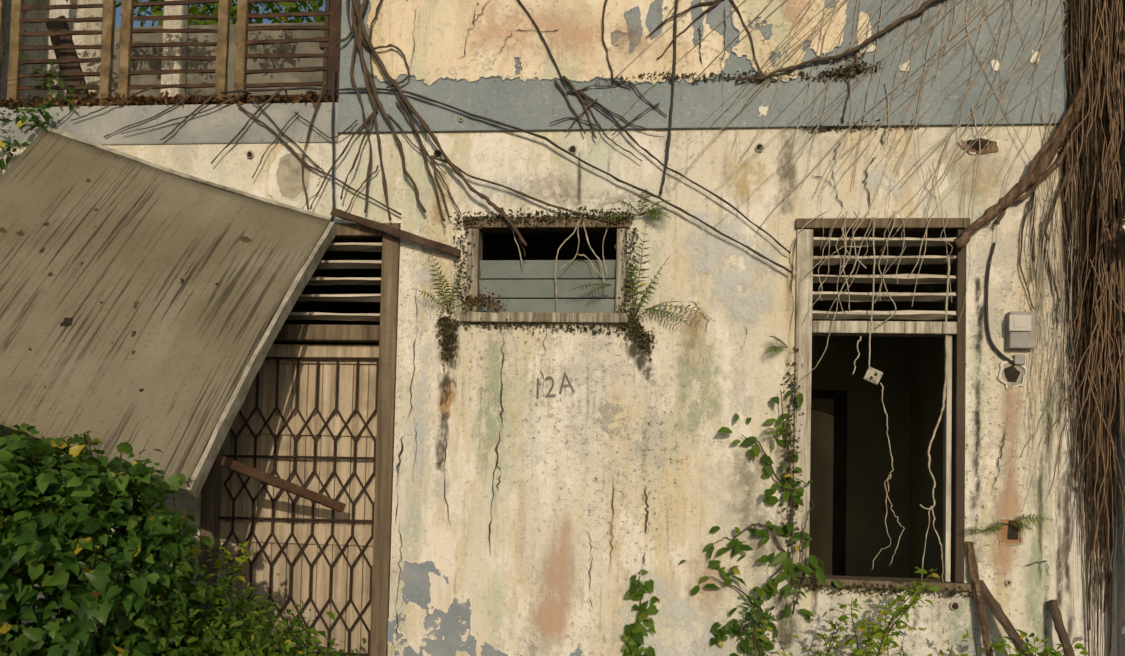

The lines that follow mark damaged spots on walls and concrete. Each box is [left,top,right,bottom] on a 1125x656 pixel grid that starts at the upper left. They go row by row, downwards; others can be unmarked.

peeling [366,0,876,86]
crack [812,127,886,209]
spalling [958,136,1000,154]
damp [628,329,651,380]
crack [395,277,418,634]
corrosion [441,385,453,417]
crack [443,387,451,525]
crack [488,332,505,548]
peeling [387,559,538,656]